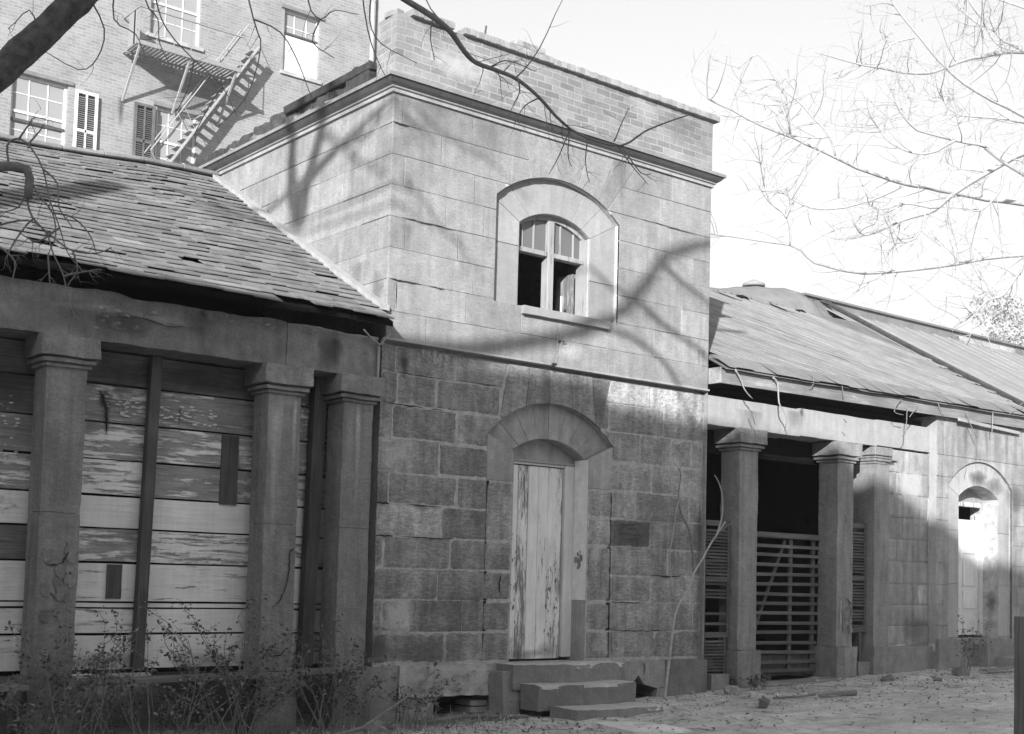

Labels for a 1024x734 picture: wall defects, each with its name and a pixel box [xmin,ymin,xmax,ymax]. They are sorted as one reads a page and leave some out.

peeling [159,406,239,505]
crack [272,549,293,608]